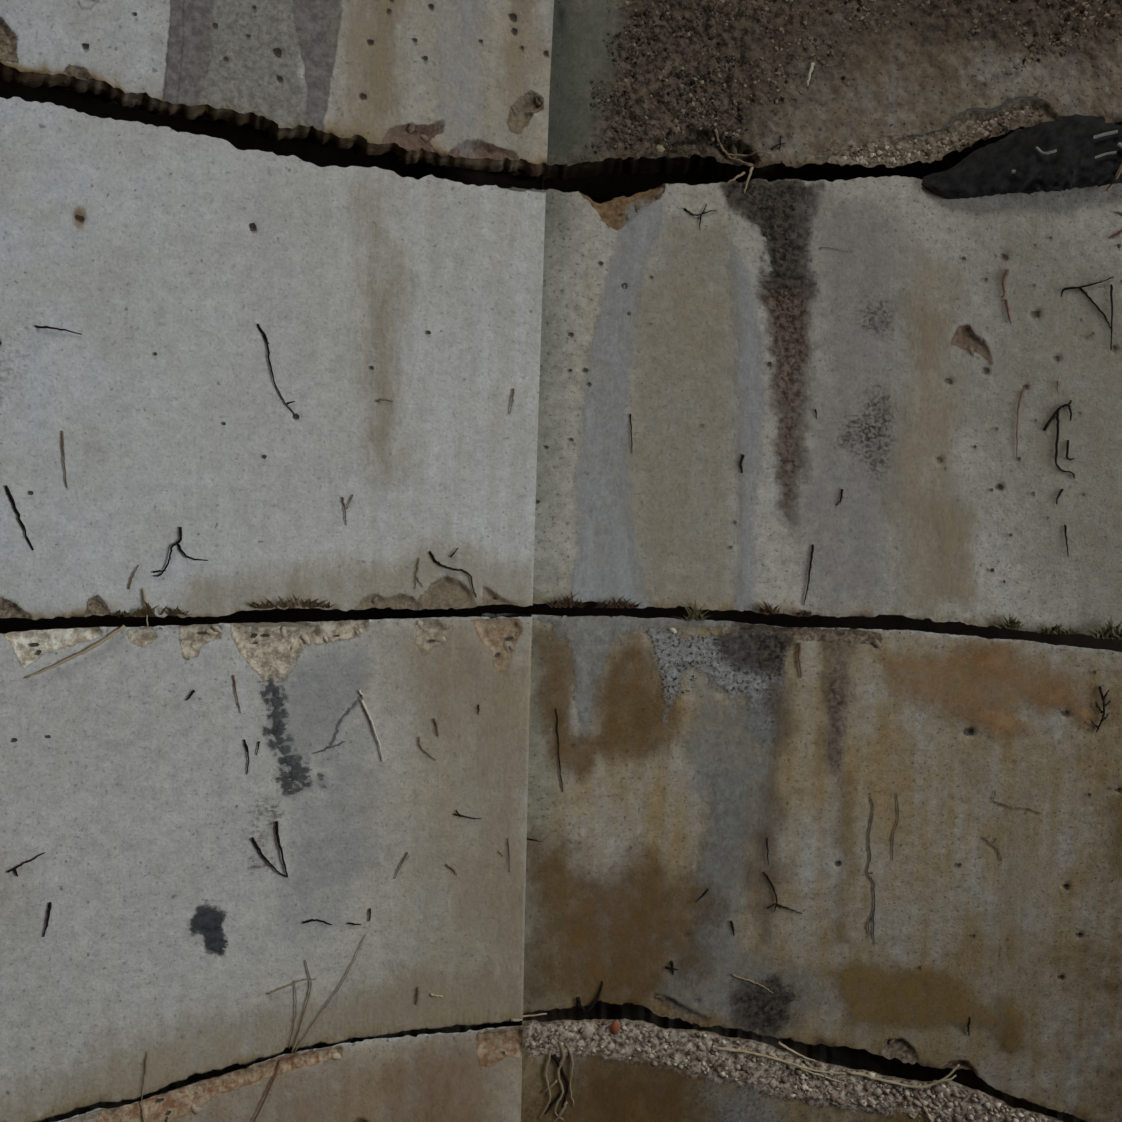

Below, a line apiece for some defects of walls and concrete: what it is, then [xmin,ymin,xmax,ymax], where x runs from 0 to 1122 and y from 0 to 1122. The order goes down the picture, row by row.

spalling [642,133,762,167]
spalling [828,98,1066,168]
crack [891,93,1043,150]
water stain [834,385,893,478]
spalling [178,576,523,682]
water stain [541,178,825,1037]
water stain [259,675,326,796]
water stain [193,909,228,954]
spalling [476,993,1060,1122]